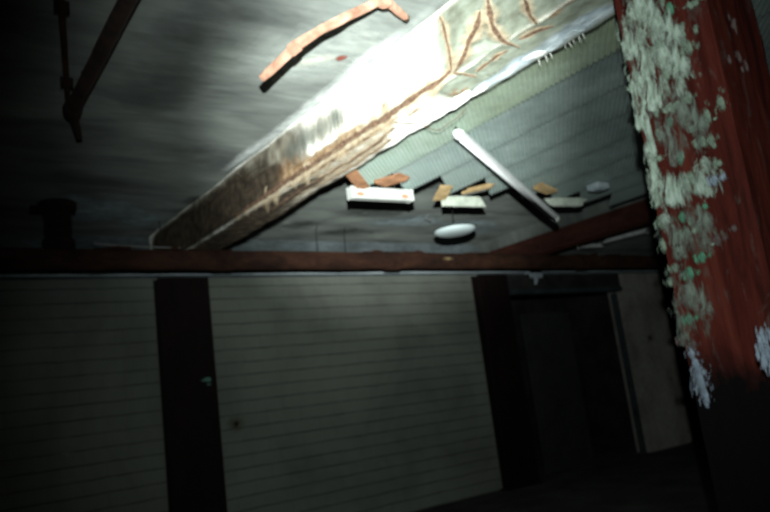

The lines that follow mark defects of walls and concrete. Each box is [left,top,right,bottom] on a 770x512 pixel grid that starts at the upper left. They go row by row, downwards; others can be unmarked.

water stain [287,111,337,154]
crack [236,0,554,218]